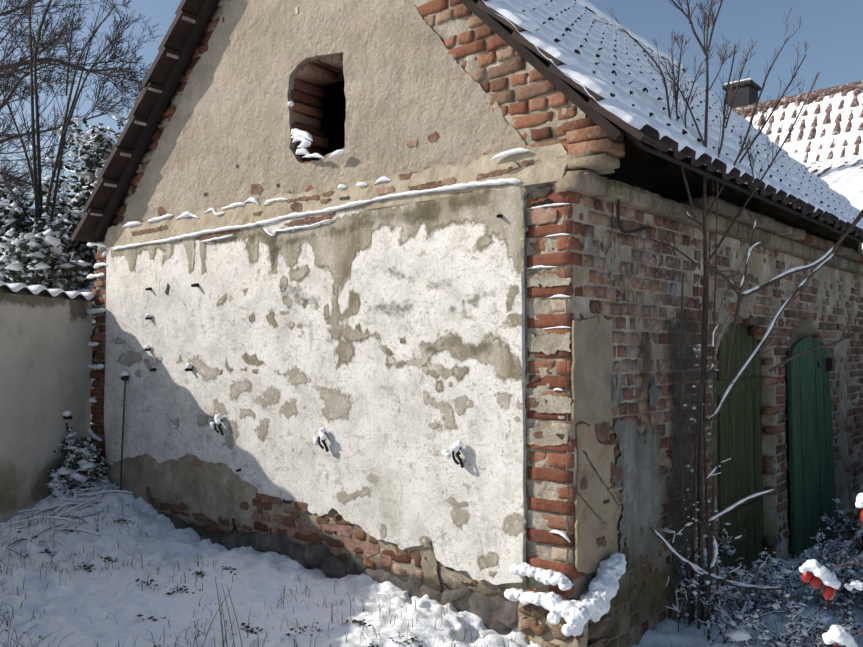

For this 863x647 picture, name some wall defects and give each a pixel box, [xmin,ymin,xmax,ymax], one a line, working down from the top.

peeling [111,159,572,430]
peeling [176,353,297,449]
flaking render [527,426,568,446]
peeling [596,371,666,579]
flaking render [146,487,219,529]
flaking render [240,487,431,566]
peeling [446,496,469,529]
peeling [502,513,526,536]
flaking render [439,551,500,595]